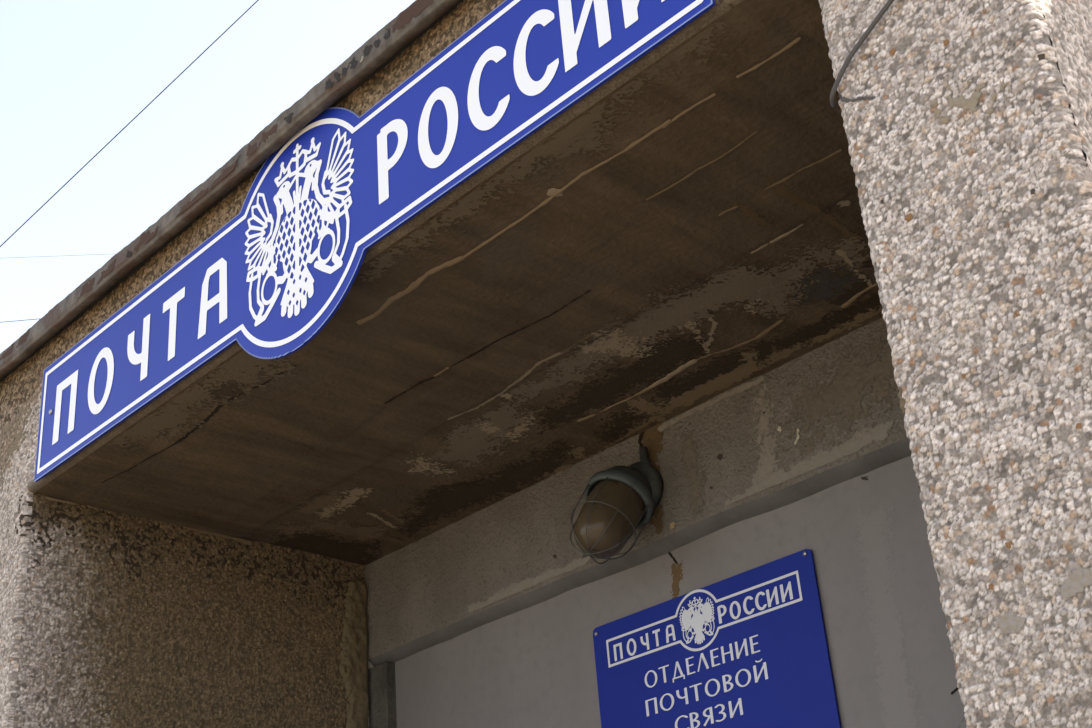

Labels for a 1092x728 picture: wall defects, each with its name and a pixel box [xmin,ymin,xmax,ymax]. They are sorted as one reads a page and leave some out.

damp [0,170,899,615]
crack [383,290,591,404]
crack [447,352,564,420]
corrosion [670,560,683,599]